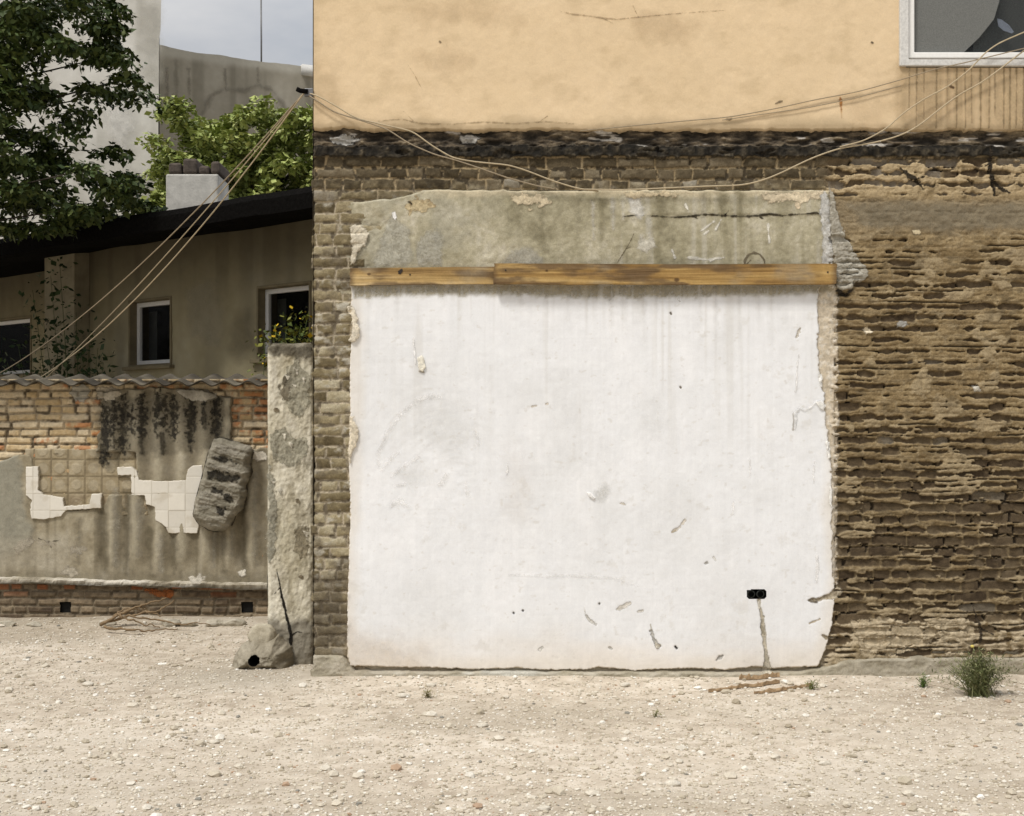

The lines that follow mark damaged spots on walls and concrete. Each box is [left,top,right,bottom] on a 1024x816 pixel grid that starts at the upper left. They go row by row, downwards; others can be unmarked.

spalling [392,195,436,219]
spalling [510,193,552,211]
crack [617,212,819,263]
crack [274,572,302,645]
spalling [851,616,976,657]